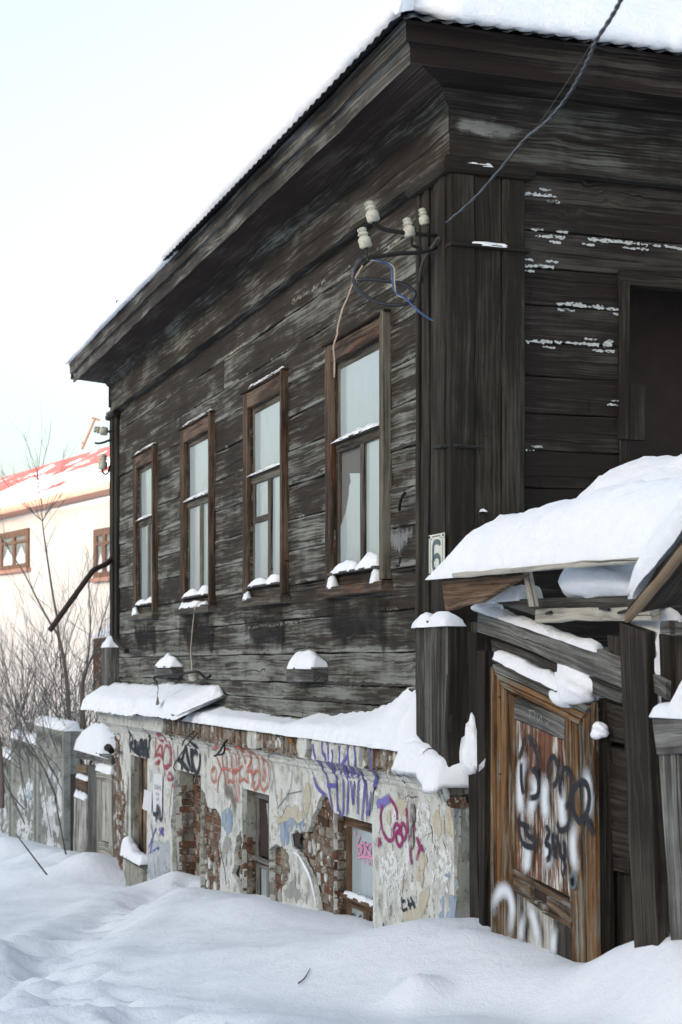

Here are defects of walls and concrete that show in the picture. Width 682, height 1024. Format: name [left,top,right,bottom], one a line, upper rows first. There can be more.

peeling [526,187,560,204]
peeling [531,228,568,244]
peeling [582,237,682,251]
peeling [525,258,559,272]
peeling [557,302,618,316]
peeling [526,337,615,353]
flaking render [113,733,127,880]
flaking render [164,718,344,915]
peeling [379,788,469,922]